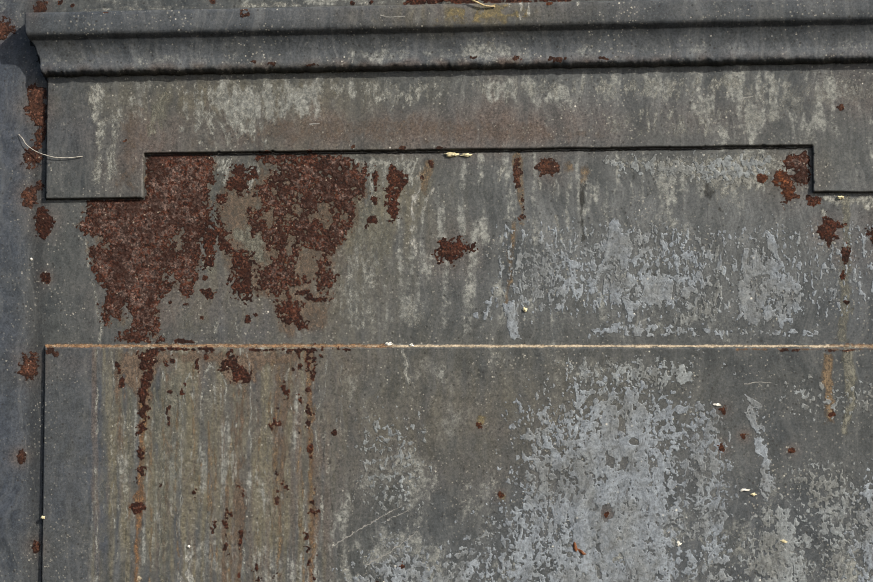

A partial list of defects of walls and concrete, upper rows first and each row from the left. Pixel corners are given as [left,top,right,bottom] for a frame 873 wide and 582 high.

corrosion [20,83,47,170]
corrosion [431,235,478,267]
corrosion [511,153,526,247]
corrosion [534,157,587,183]
corrosion [756,150,851,280]
corrosion [15,145,409,582]